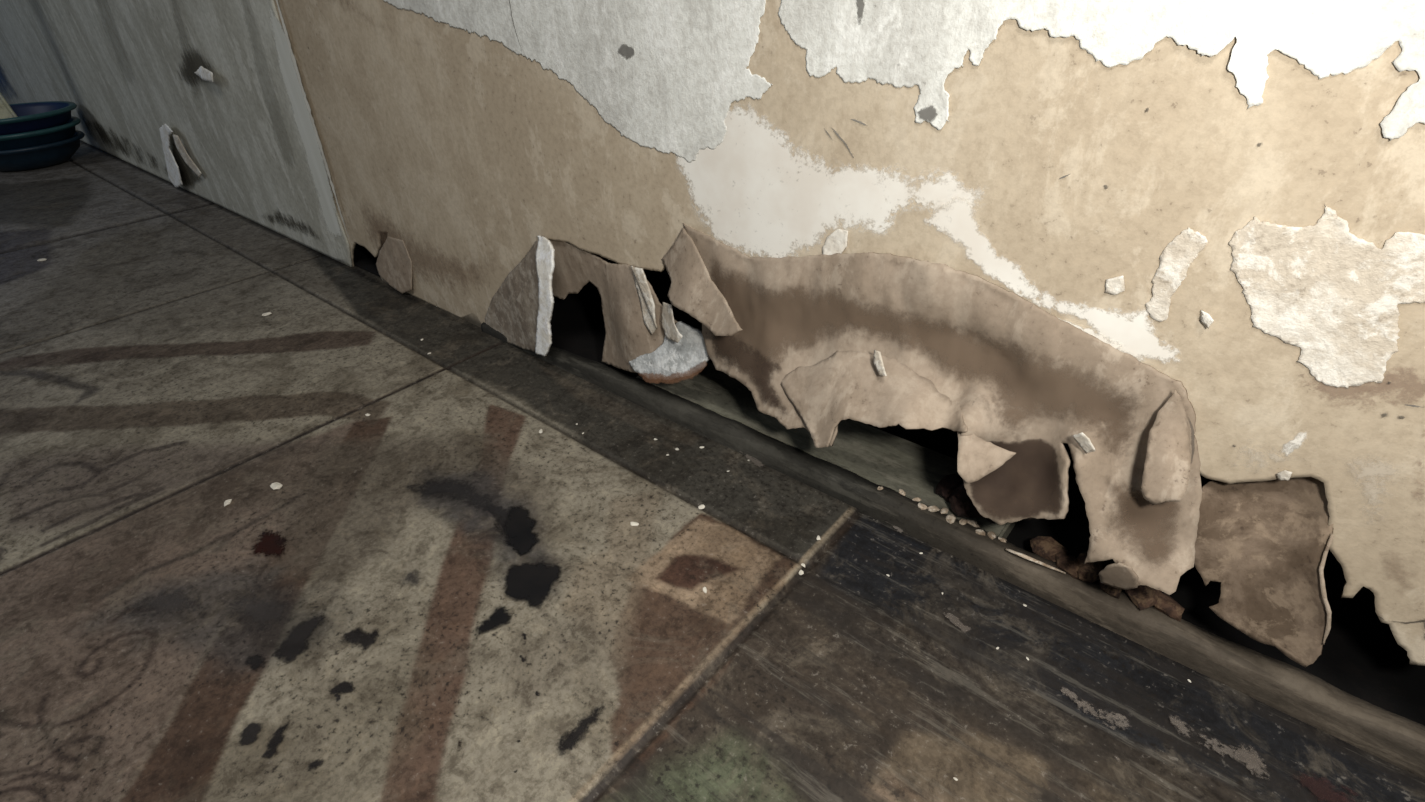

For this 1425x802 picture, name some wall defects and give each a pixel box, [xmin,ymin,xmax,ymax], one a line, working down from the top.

peeling [383,0,1425,388]
peeling [1073,432,1096,454]
peeling [1245,433,1307,480]